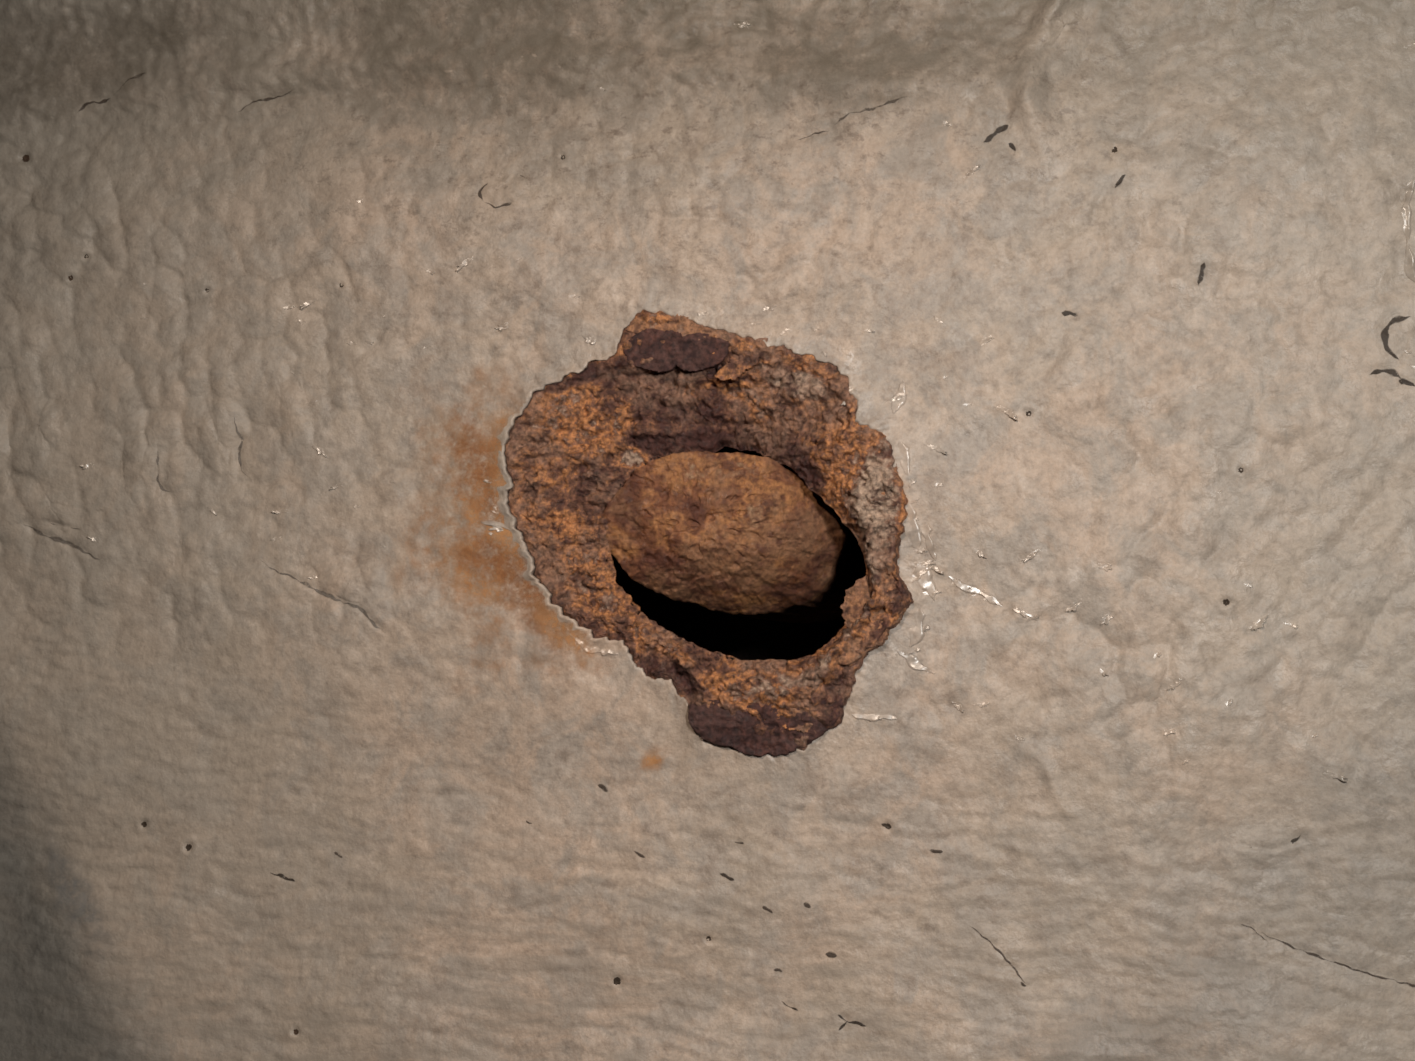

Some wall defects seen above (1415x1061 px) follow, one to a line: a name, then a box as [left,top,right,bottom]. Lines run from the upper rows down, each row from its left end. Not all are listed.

crack [270,568,378,628]
corrosion [444,310,914,757]
peeling [479,290,1039,777]
crack [1242,924,1415,987]